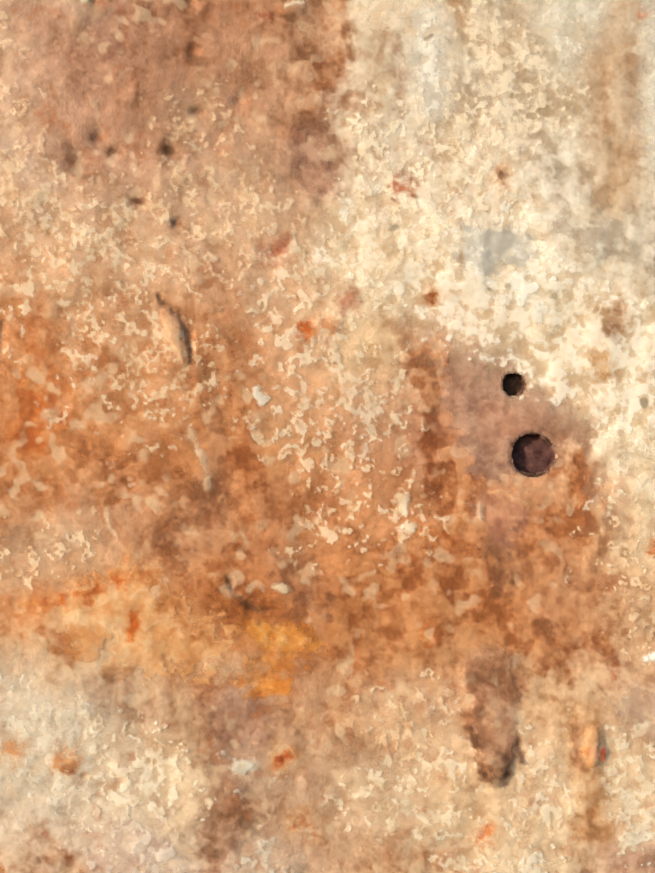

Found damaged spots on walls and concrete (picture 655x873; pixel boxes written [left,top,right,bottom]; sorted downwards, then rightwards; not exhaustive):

leakage [586,0,649,211]
rust [299,321,337,338]
rust [597,308,623,333]
rust [0,345,87,454]
rust [58,394,168,488]
peeling [253,387,267,404]
rust [406,332,481,519]
rust [545,433,618,557]
rust [160,338,326,873]
rust [432,532,613,674]